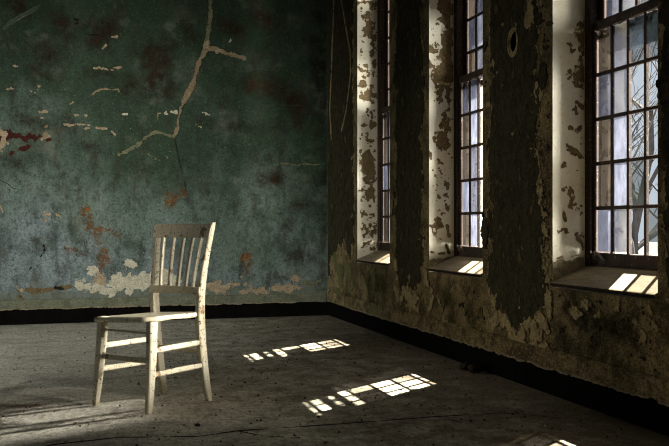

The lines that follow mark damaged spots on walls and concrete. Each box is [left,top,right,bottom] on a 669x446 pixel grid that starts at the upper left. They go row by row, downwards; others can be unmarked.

peeling [0,110,52,157]
peeling [63,114,116,136]
crack [117,0,246,192]
peeling [205,0,377,305]
peeling [391,0,453,322]
peeling [458,0,585,349]
peeling [656,0,669,287]
peeling [16,258,182,300]
peeling [568,296,663,350]